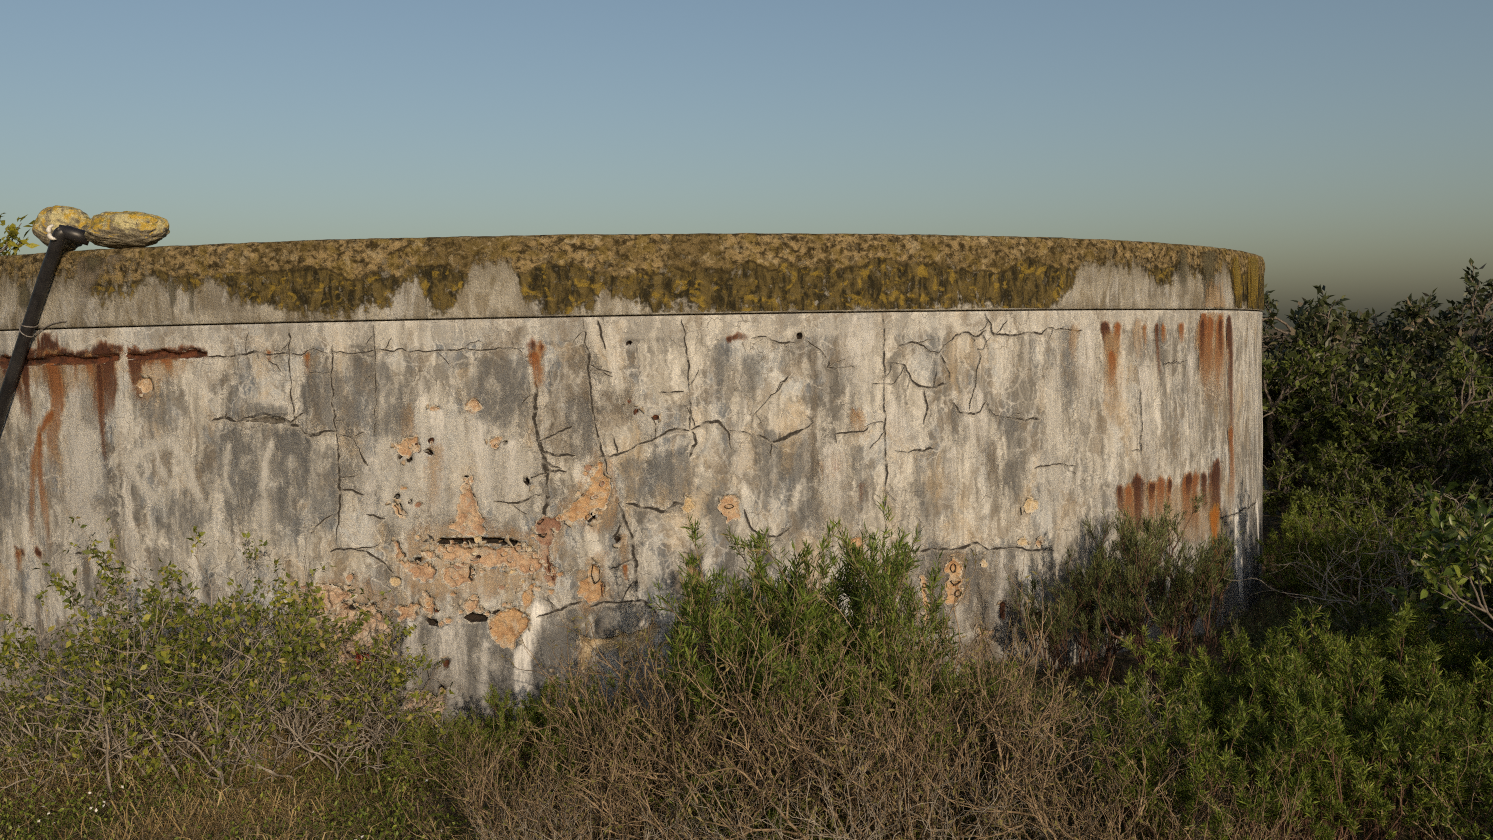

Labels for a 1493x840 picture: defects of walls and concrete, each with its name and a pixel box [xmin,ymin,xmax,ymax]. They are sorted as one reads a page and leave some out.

corrosion [0,333,207,519]
leakage [125,393,342,546]
spalling [390,435,435,468]
leakage [304,361,527,522]
corrosion [517,336,544,381]
crack [208,313,1082,617]
corrosion [1102,320,1122,380]
crack [1134,359,1185,457]
corrosion [1117,313,1235,599]
spalling [294,461,661,725]
leakage [386,600,574,724]
leakage [1224,480,1263,615]